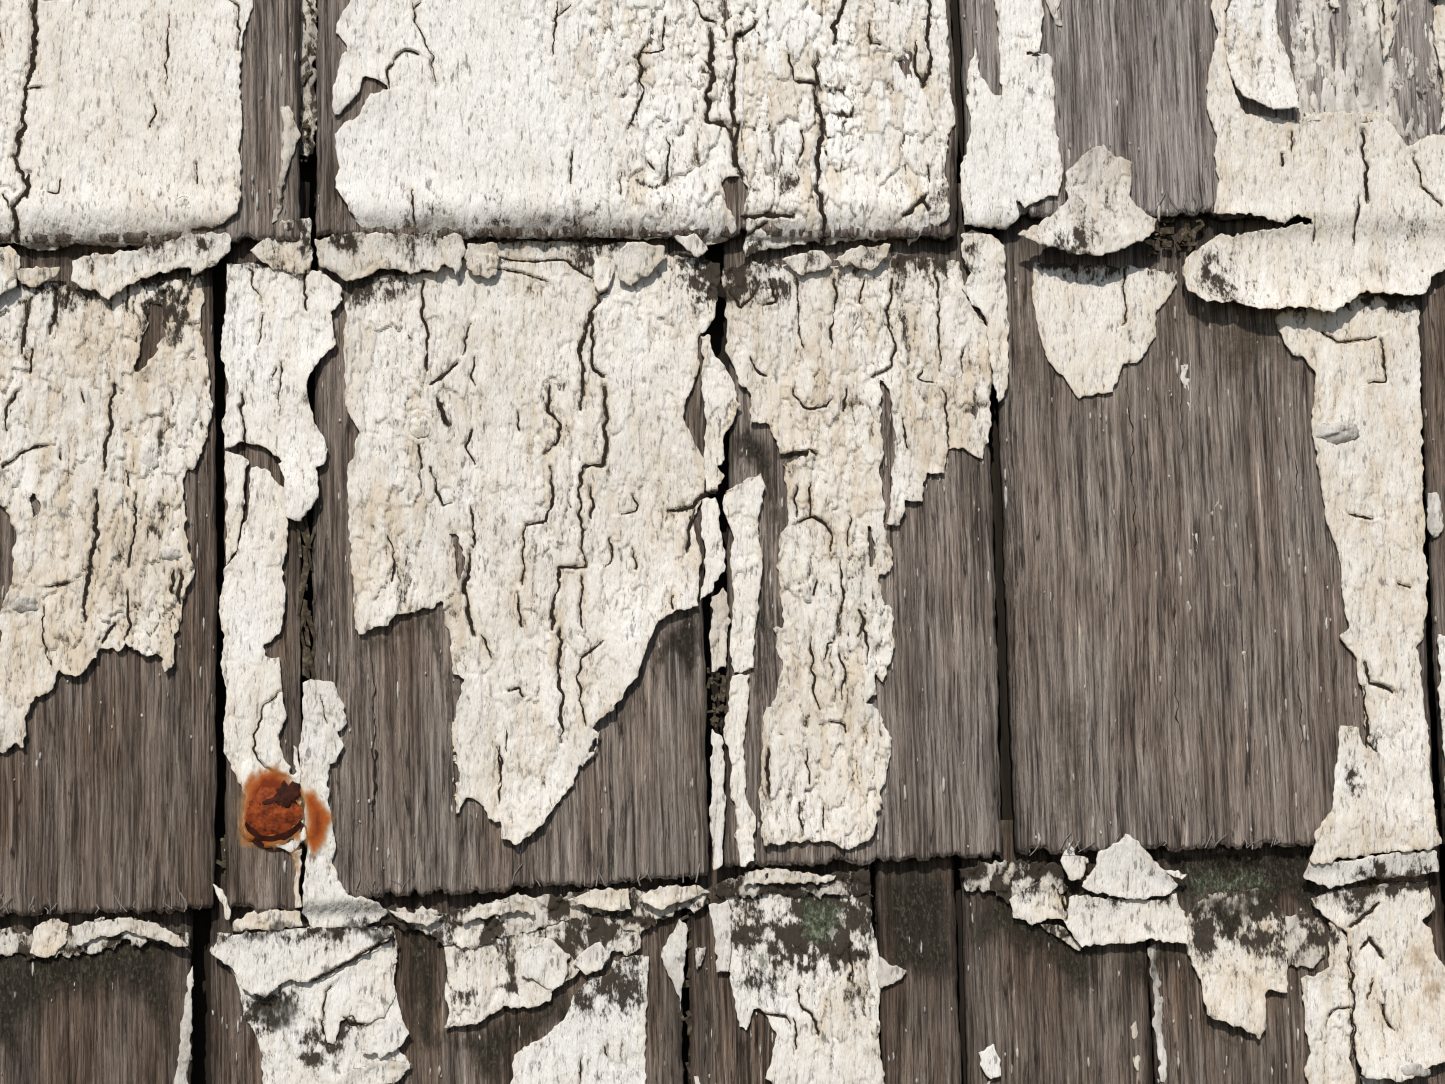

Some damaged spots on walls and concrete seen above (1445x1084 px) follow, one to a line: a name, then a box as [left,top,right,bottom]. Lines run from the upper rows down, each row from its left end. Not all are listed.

crack [2,0,61,240]
crack [628,1,756,179]
crack [740,0,880,246]
crack [913,0,933,86]
crack [417,283,491,656]
peeling [0,0,1156,1084]
crack [498,256,722,737]
crack [784,450,869,729]
crack [730,274,964,444]
peeling [958,0,1445,1084]
corrosion [240,765,332,870]
crack [765,749,824,835]